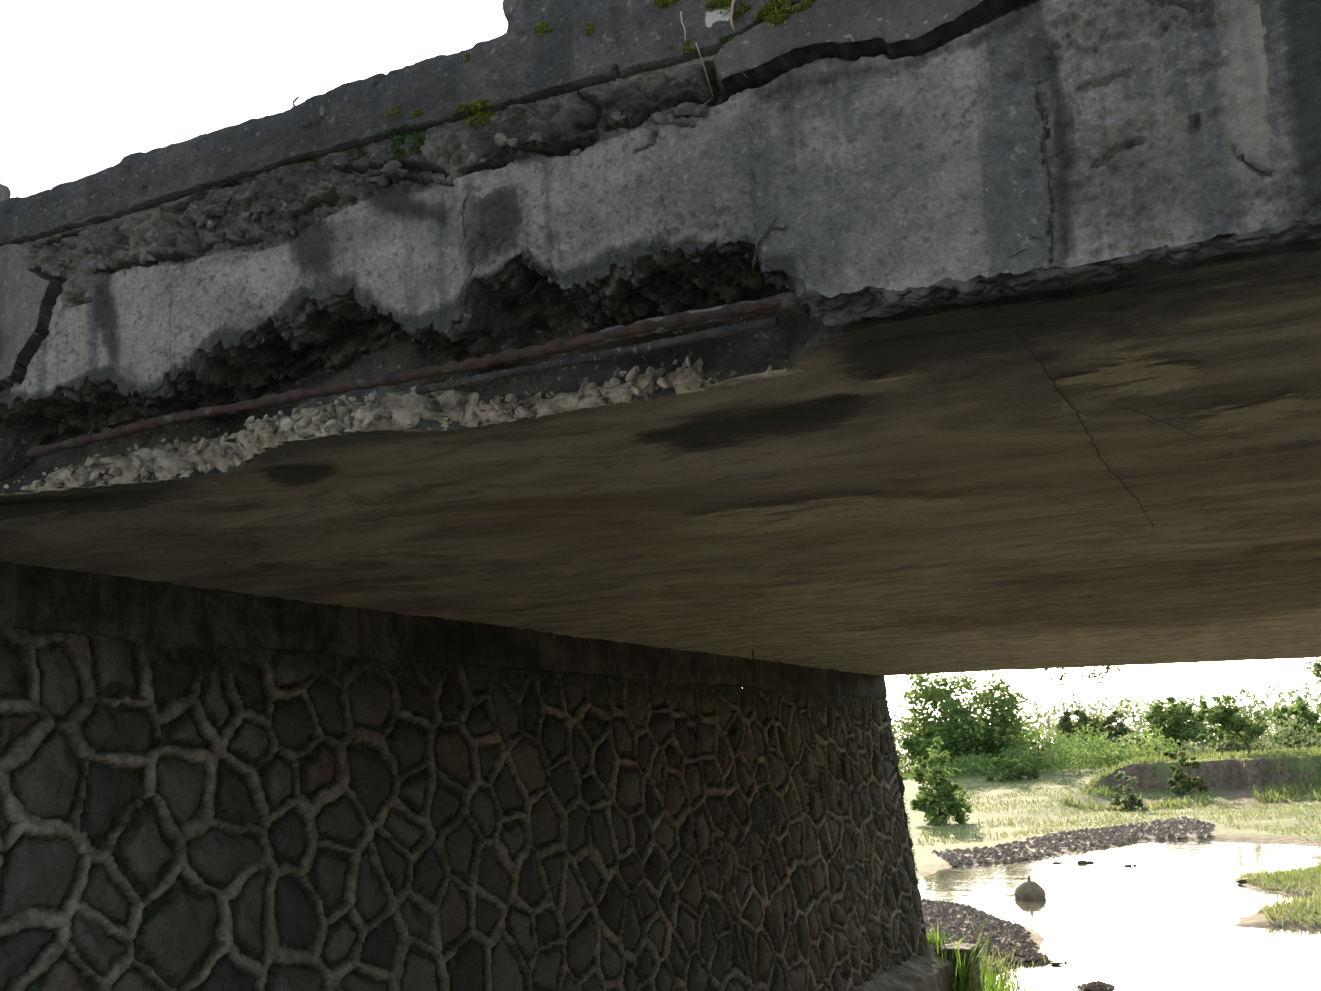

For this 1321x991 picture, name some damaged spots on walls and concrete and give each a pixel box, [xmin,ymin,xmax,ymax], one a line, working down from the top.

crack [722,0,1039,96]
spalling [0,0,1321,496]
crack [0,268,66,390]
damp [826,266,1275,384]
damp [631,398,878,453]
crack [992,310,1153,527]